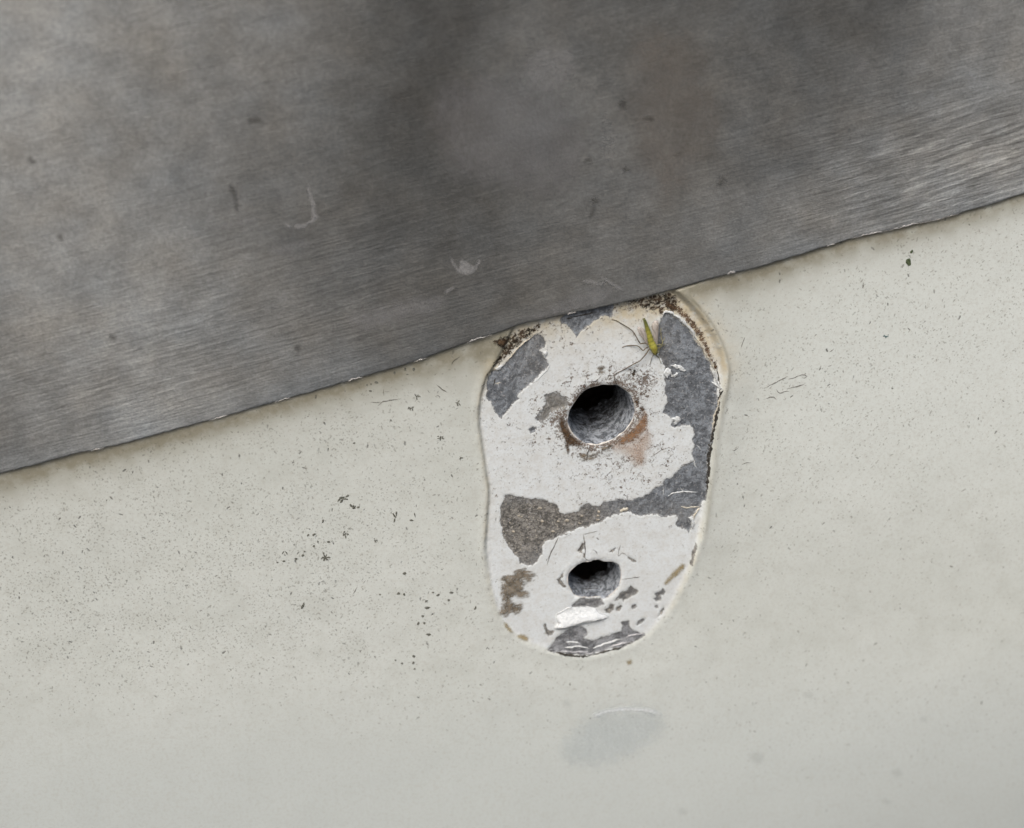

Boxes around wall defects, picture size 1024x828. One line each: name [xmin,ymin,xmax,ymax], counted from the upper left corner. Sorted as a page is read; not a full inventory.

peeling [560,305,614,337]
peeling [486,334,550,419]
peeling [500,310,722,565]
rust [620,399,648,444]
peeling [543,586,646,658]